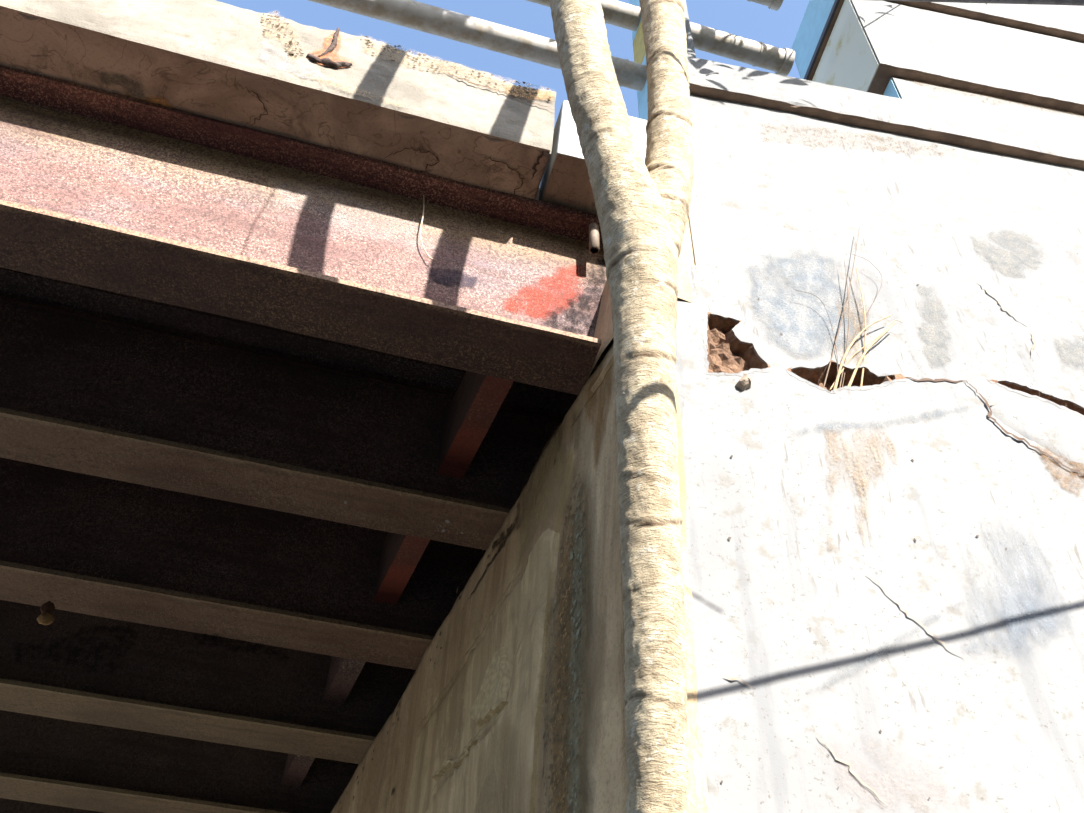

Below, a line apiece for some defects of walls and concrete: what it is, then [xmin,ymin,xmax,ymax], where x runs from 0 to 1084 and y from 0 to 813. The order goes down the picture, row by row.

corrosion [306,28,352,69]
corrosion [430,268,477,287]
corrosion [506,259,606,334]
spalling [702,309,773,391]
crack [785,357,1084,492]
leakage [518,415,587,813]